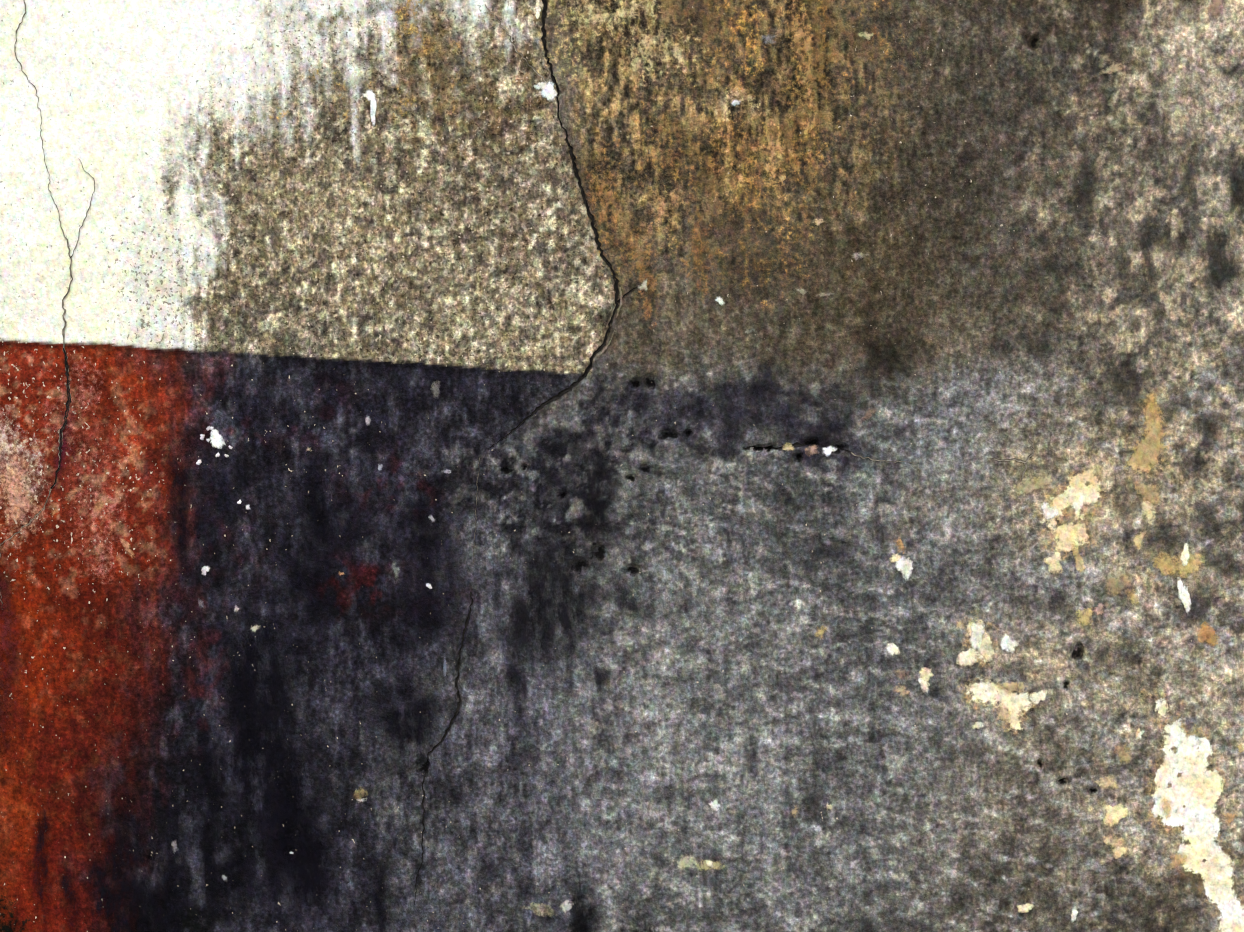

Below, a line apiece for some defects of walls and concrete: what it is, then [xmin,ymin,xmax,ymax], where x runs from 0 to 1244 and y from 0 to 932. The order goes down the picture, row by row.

corrosion [575,0,911,325]
crack [0,0,95,557]
crack [414,0,639,904]
water stain [533,427,618,552]
water stain [507,543,596,703]
water stain [34,809,78,917]
water stain [188,625,323,906]
water stain [571,885,598,932]
flaking render [1090,777,1117,793]
flaking render [1103,804,1128,859]
flaking render [1115,728,1144,762]
spalling [1147,692,1244,932]